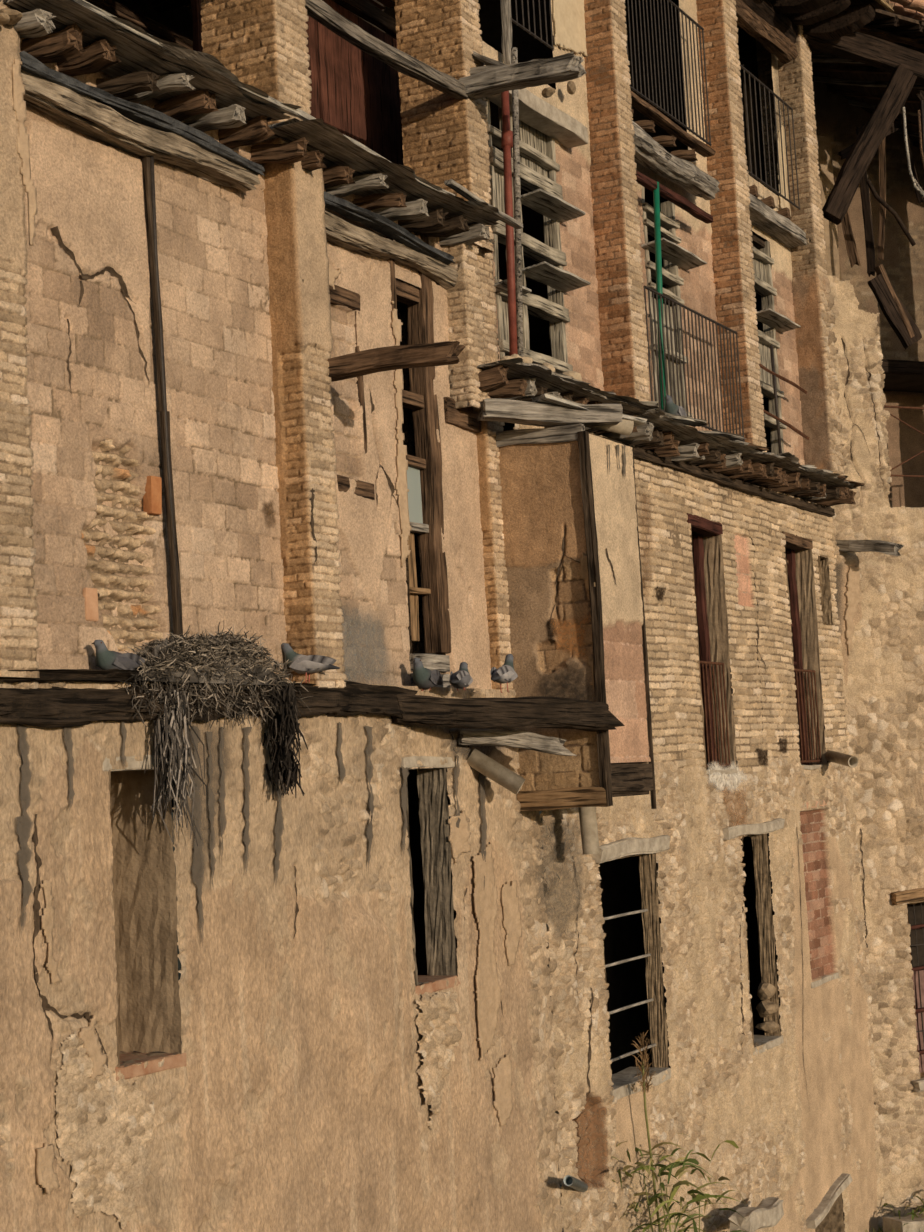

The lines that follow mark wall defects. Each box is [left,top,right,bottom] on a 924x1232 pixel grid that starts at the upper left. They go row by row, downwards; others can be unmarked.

crack [50,226,149,398]
spalling [81,439,163,652]
leakage [16,724,33,927]
leakage [64,726,75,809]
leakage [189,726,227,938]
leakage [243,727,252,871]
leakage [274,779,284,884]
leakage [337,722,346,784]
leakage [365,725,374,870]
leakage [478,772,487,885]
leakage [709,764,747,790]
crack [33,814,108,1067]